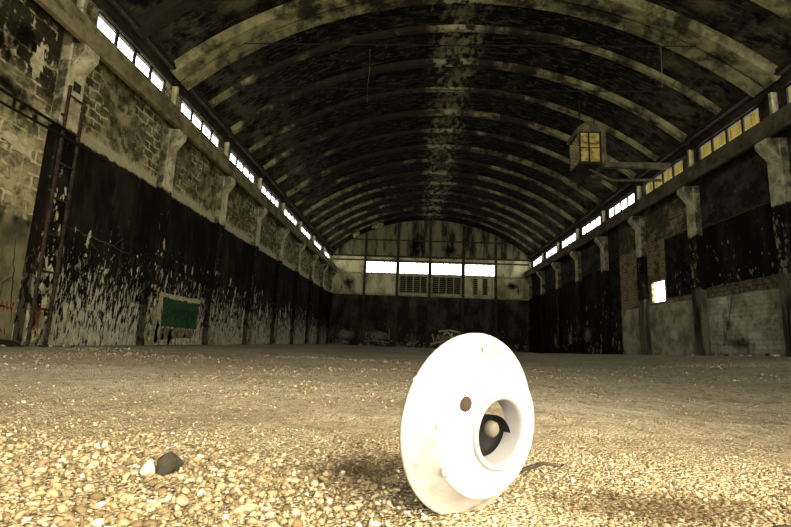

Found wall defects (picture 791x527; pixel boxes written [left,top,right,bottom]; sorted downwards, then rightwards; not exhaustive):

spalling [30,38,49,79]
spalling [0,131,40,159]